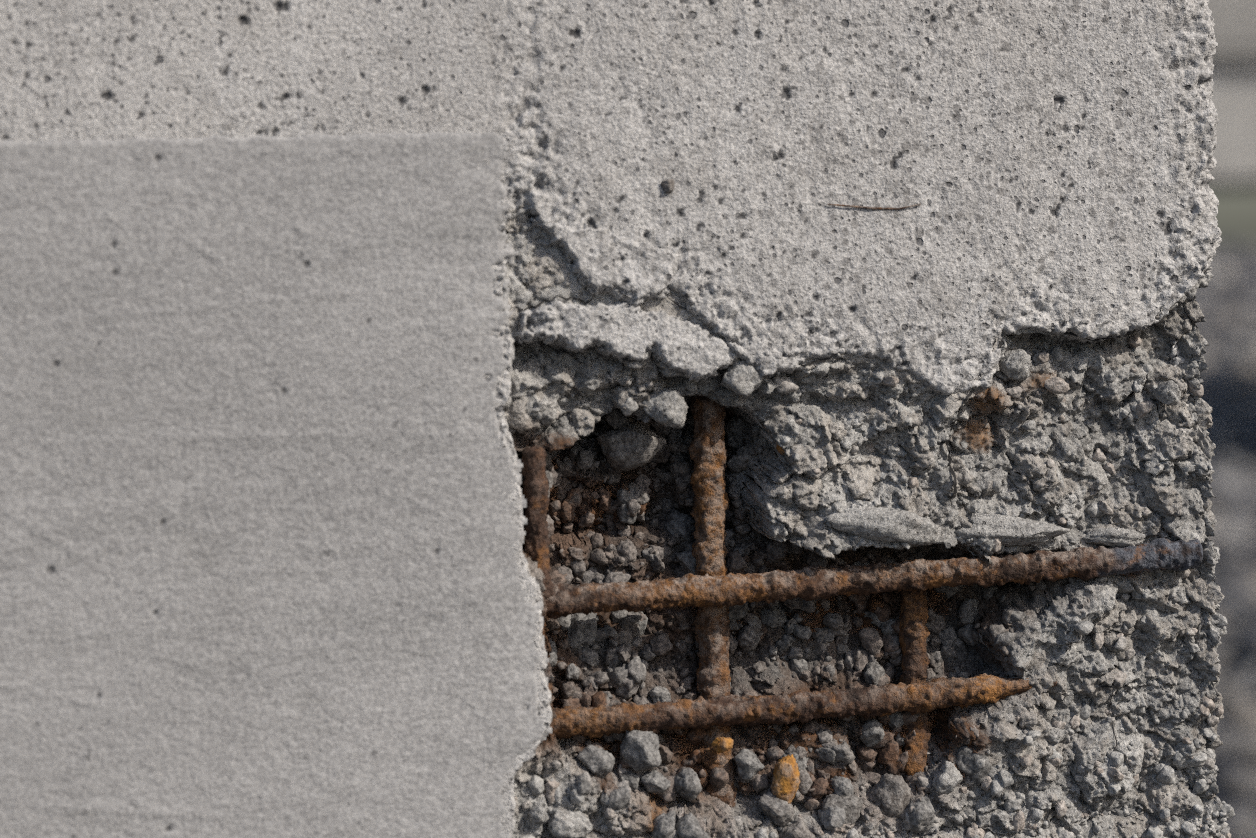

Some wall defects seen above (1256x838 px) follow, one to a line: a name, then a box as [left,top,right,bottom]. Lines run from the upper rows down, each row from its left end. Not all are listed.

spalling [661,179,675,194]
rust [544,438,575,499]
spalling [499,205,1235,838]
rust [787,592,887,632]
rust [542,613,551,658]
rust [542,683,563,741]
rust [582,737,622,755]
rust [675,727,718,786]
rust [765,717,840,754]
rust [827,764,853,790]
rust [928,708,988,777]